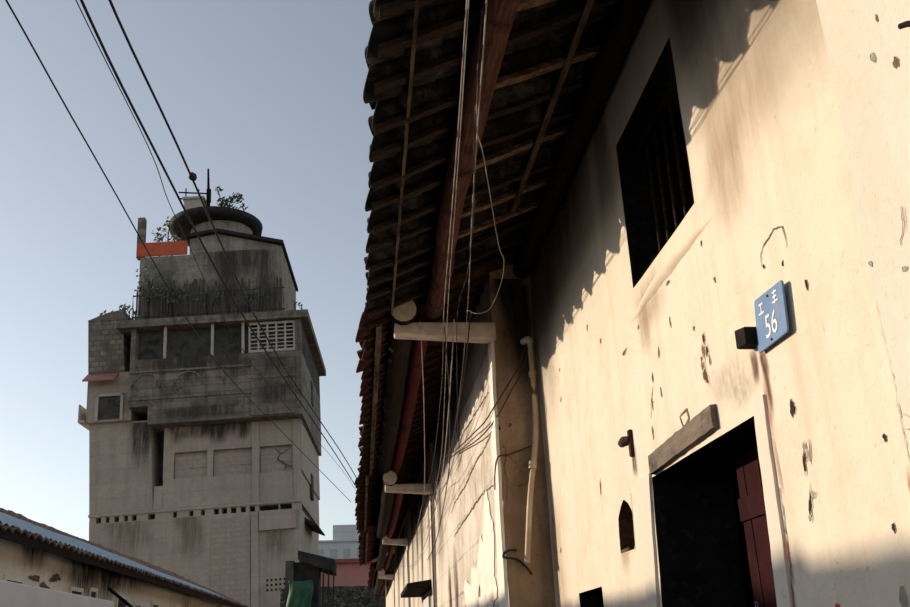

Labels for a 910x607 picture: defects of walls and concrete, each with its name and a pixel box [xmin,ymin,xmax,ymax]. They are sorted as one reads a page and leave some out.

crack [760,226,787,266]
spalling [693,326,712,388]
corrosion [751,353,772,426]
crack [874,291,910,462]
water stain [170,405,247,439]